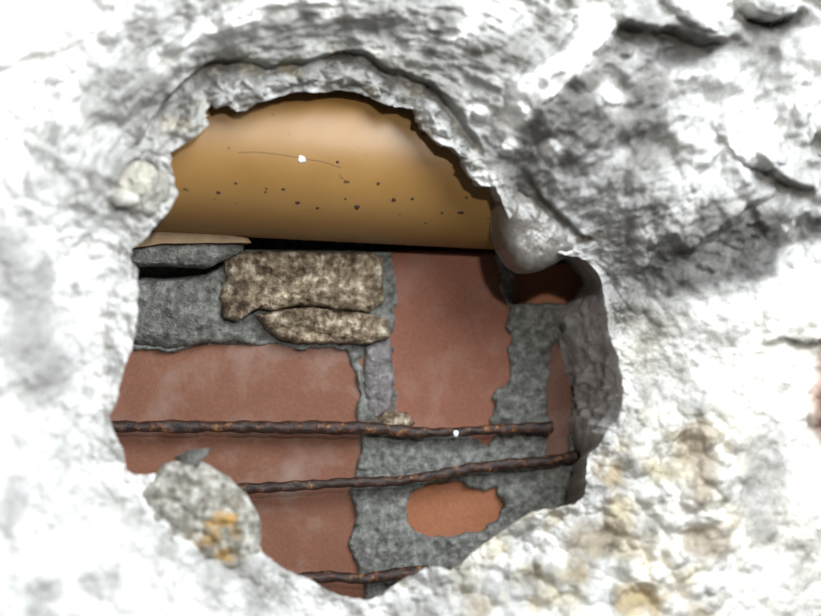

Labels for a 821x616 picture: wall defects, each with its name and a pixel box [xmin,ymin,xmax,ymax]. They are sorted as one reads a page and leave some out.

crack [694,27,717,46]
spalling [170,60,483,172]
crack [786,337,821,345]
spalling [679,418,716,505]
spalling [684,527,731,559]